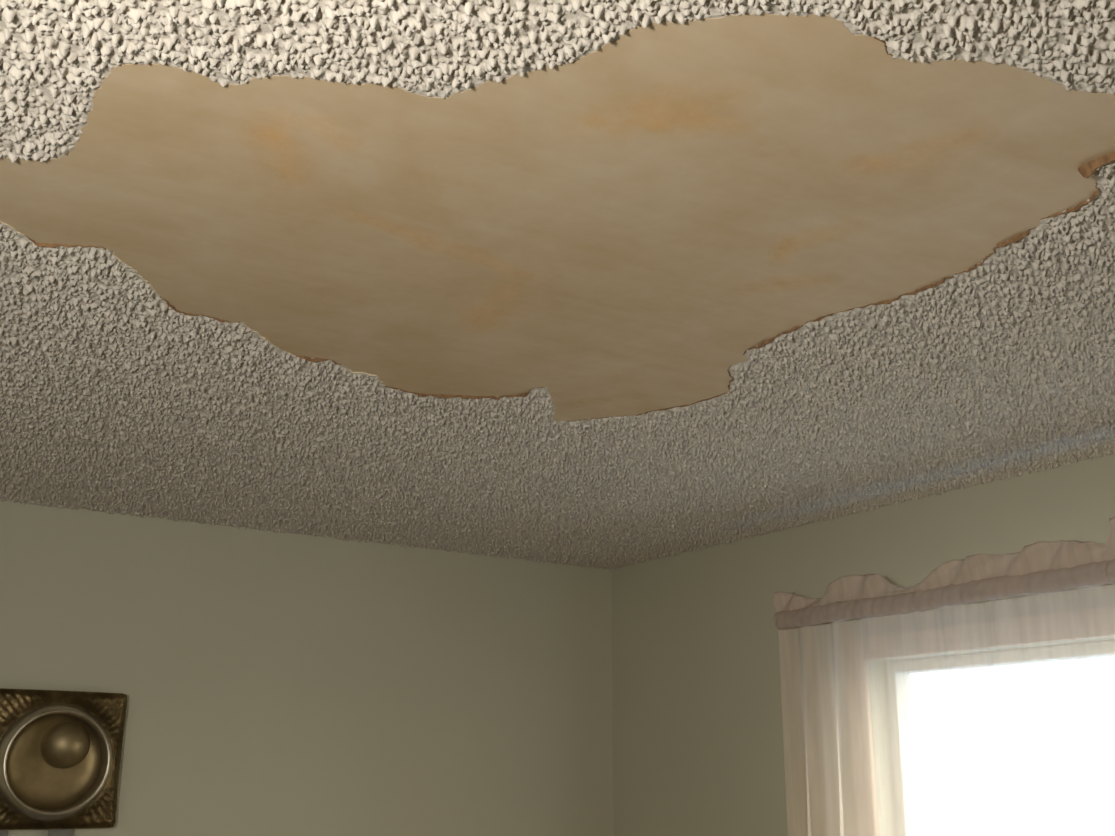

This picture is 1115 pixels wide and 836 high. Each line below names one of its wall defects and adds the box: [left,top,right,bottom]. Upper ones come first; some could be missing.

peeling [0,12,1115,422]